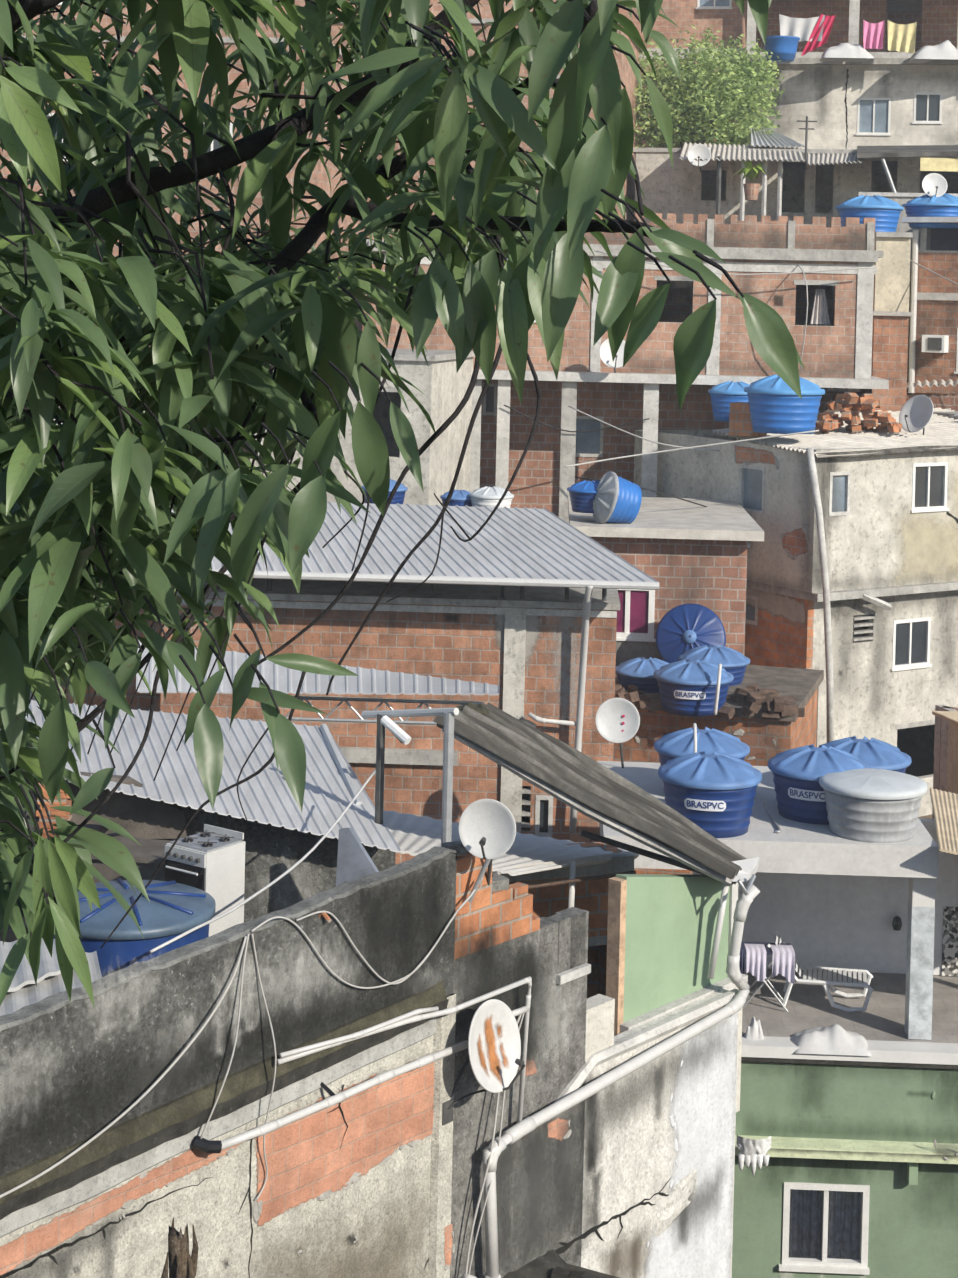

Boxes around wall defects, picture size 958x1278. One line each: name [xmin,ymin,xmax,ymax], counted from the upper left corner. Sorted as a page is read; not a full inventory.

spalling [781,523,807,560]
damp [460,941,538,1049]
damp [0,985,423,1163]
spalling [0,1052,434,1275]
crack [238,1139,253,1278]
crack [555,1177,672,1255]
peeling [645,1012,738,1278]